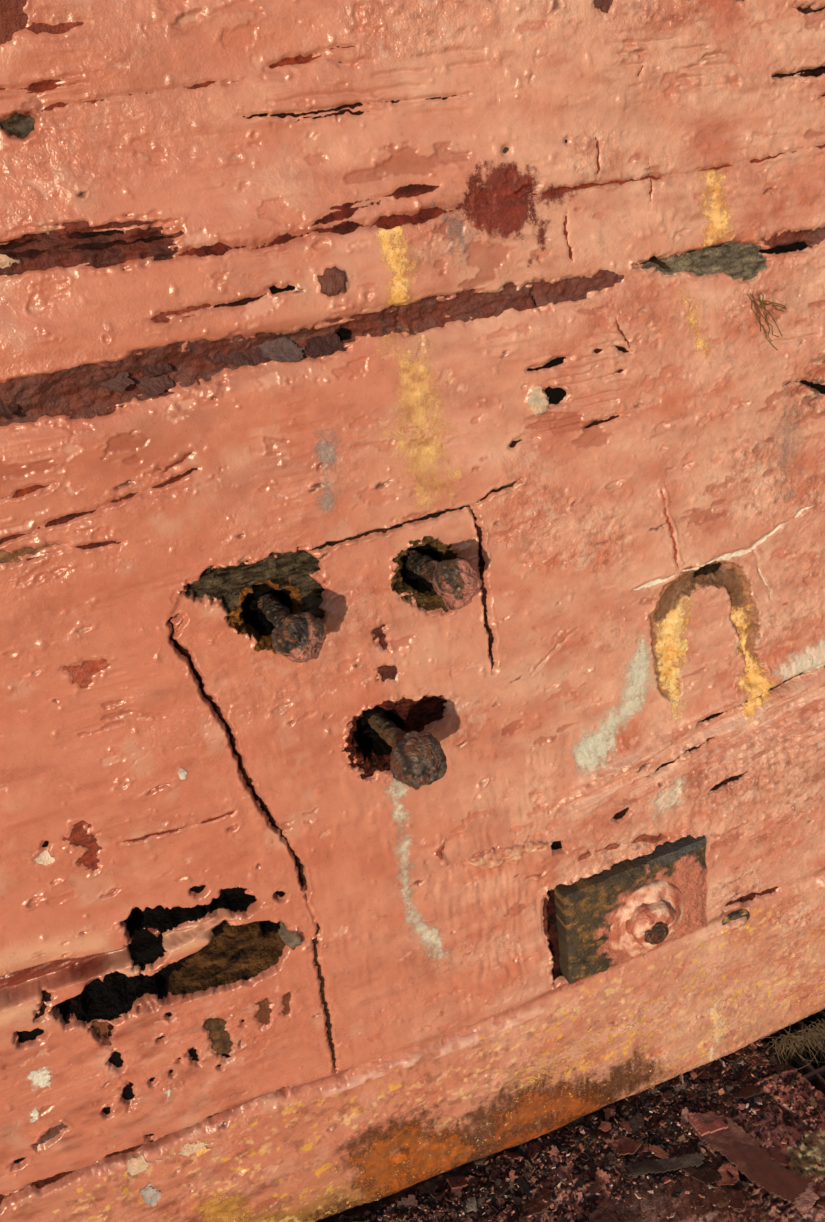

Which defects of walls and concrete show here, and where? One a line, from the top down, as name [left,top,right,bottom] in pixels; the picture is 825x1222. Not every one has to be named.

peeling [0,214,184,278]
peeling [636,227,825,281]
peeling [0,270,624,426]
peeling [784,380,825,394]
crack [310,481,516,668]
crack [124,613,307,887]
spalling [129,928,167,971]
spalling [261,920,281,934]
peeling [204,1018,233,1056]
peeling [254,992,291,1027]
crack [313,917,336,1070]
rust [306,1052,662,1222]